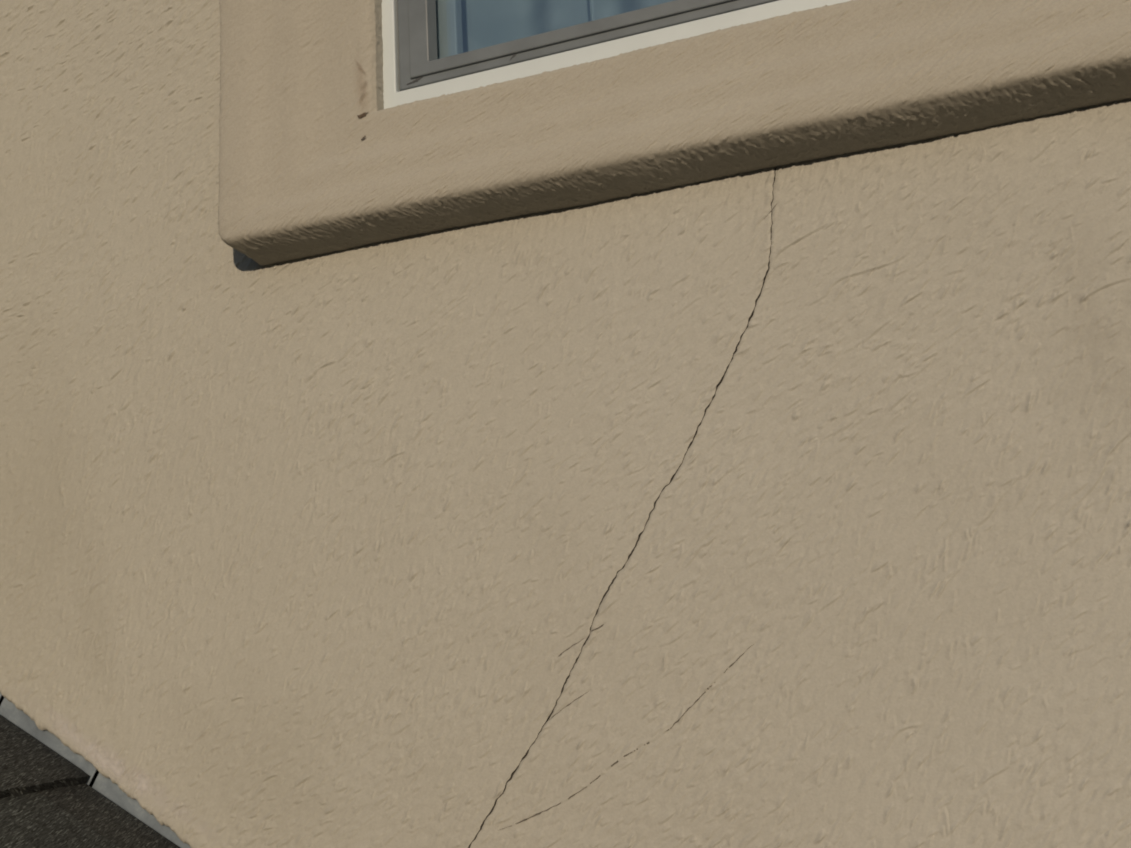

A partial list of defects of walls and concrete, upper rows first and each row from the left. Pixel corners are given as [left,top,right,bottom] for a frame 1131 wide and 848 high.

crack [468,167,777,848]